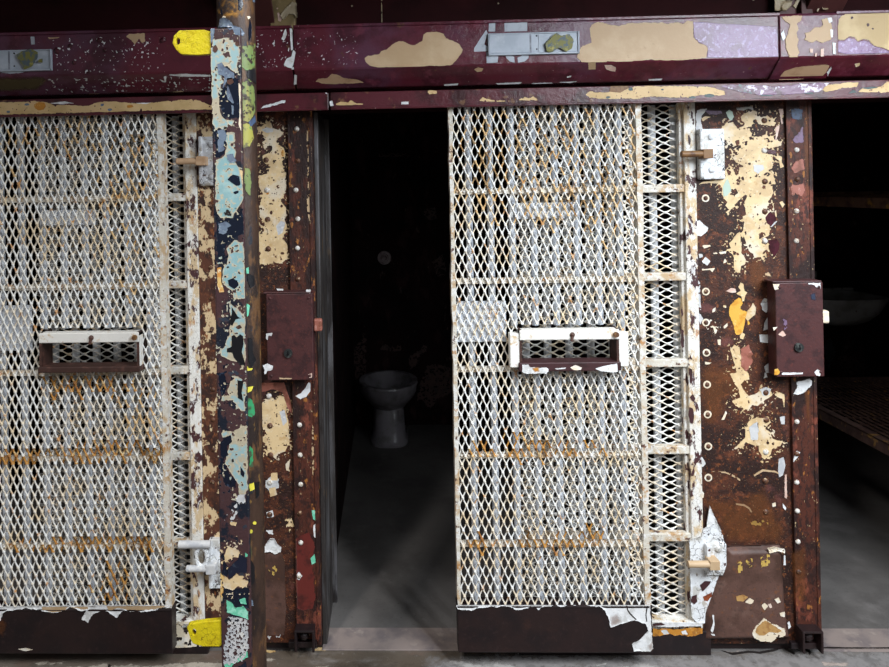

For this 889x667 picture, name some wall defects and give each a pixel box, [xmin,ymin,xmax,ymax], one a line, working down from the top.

peeling [365,32,463,67]
peeling [577,0,889,99]
peeling [688,105,865,510]
peeling [0,0,316,667]
peeling [522,364,582,374]
rust [0,375,163,465]
rust [468,432,578,465]
rust [466,531,487,556]
rust [517,522,604,556]
peeling [689,491,724,636]
peeling [588,605,653,652]
peeling [736,595,791,642]